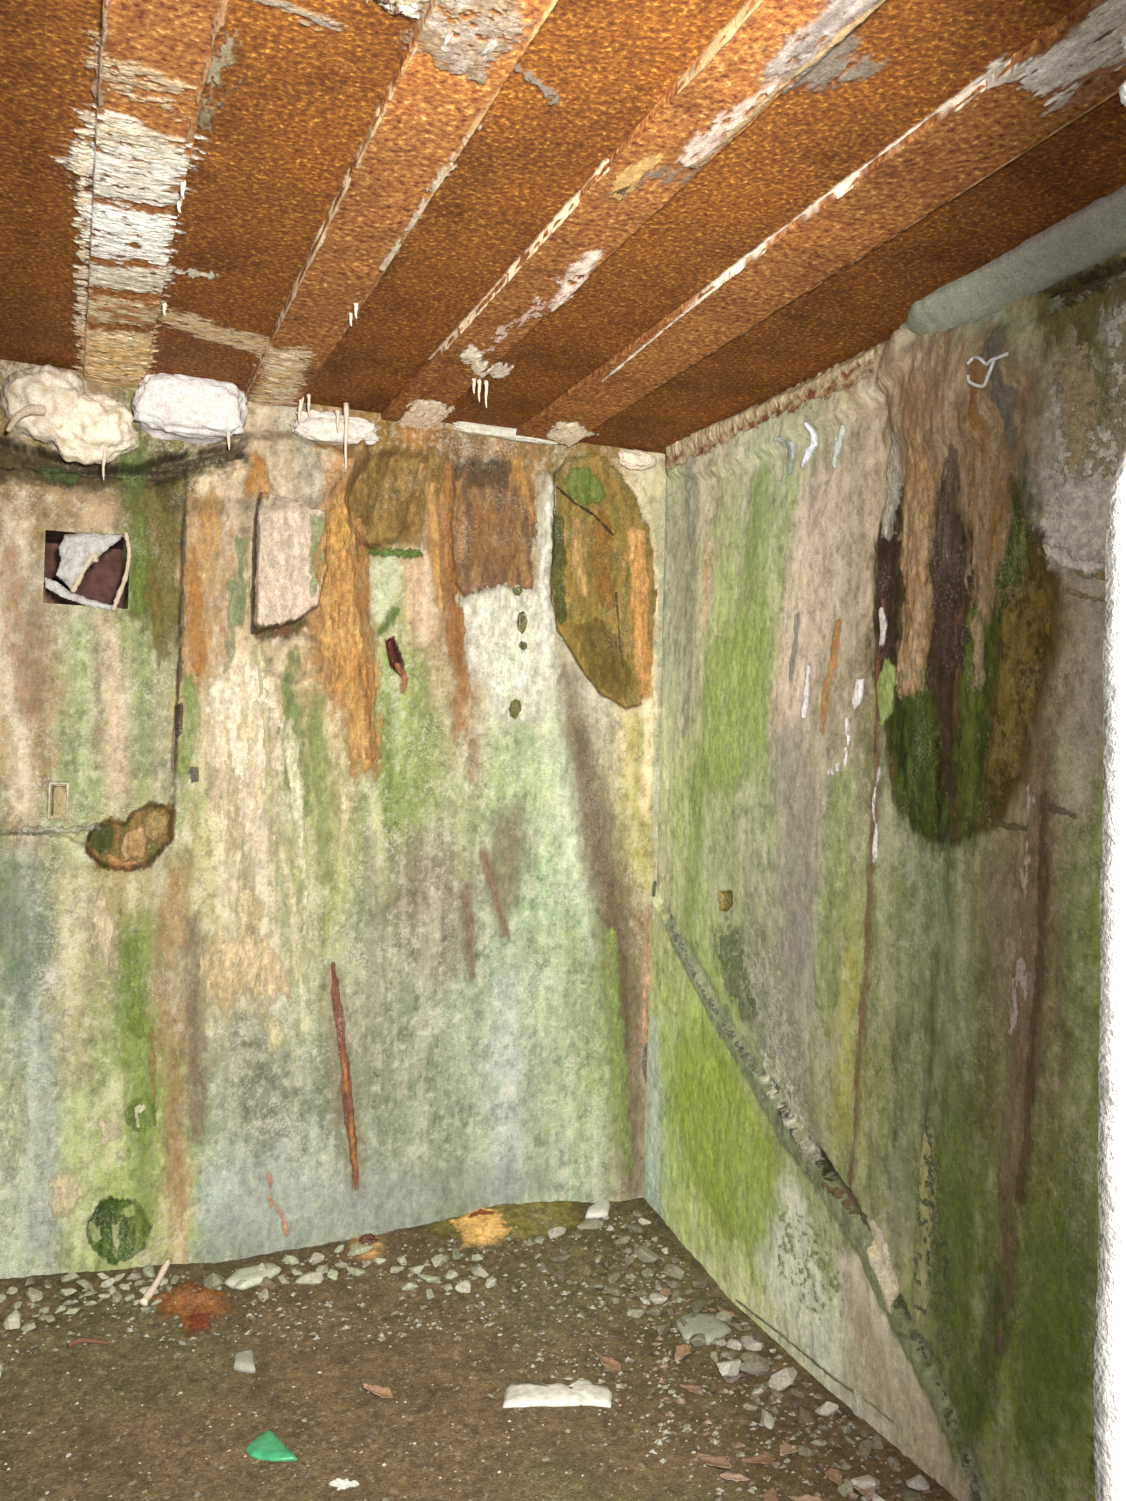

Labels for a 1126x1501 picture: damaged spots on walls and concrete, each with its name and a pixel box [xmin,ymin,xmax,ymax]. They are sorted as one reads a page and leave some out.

corrosion [666,344,880,471]
damp [1040,257,1126,420]
spalling [345,447,657,725]
damp [881,336,1015,792]
corrosion [331,962,361,1192]
damp [712,722,821,1167]
crack [639,881,989,1501]